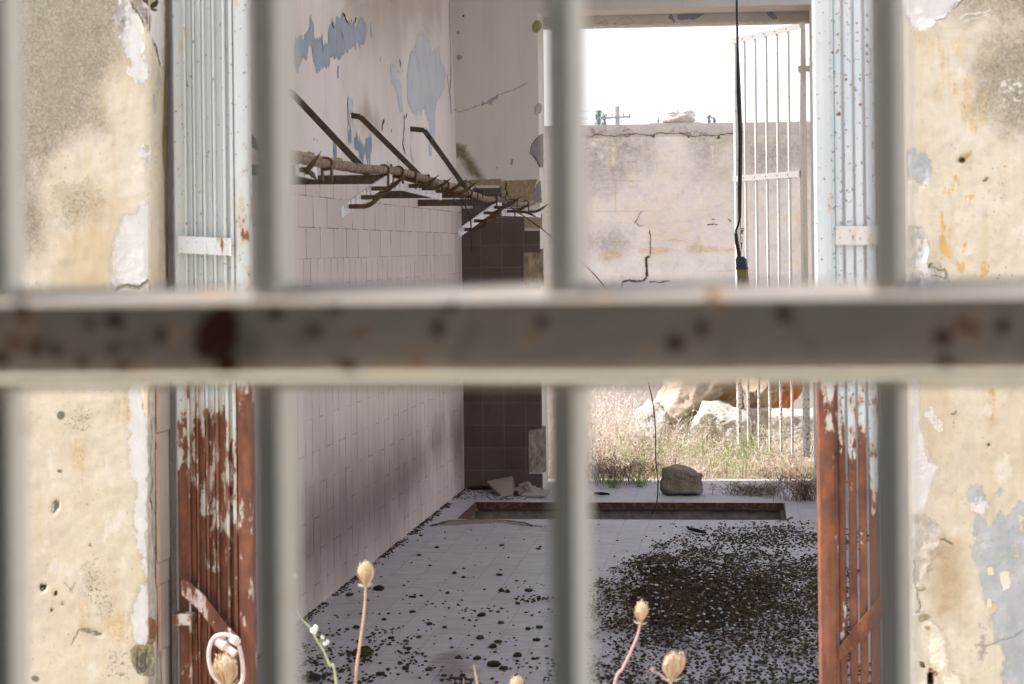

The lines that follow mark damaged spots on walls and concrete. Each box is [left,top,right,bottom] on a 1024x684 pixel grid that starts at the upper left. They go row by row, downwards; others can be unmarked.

peeling [113,0,165,112]
peeling [295,13,372,78]
peeling [909,0,960,31]
crack [447,77,528,112]
crack [587,131,743,139]
peeling [458,179,542,228]
peeling [111,203,149,287]
crack [622,212,671,283]
corrosion [195,305,241,375]
spalling [127,388,162,684]
peeling [967,484,1024,684]
spalling [916,612,962,684]